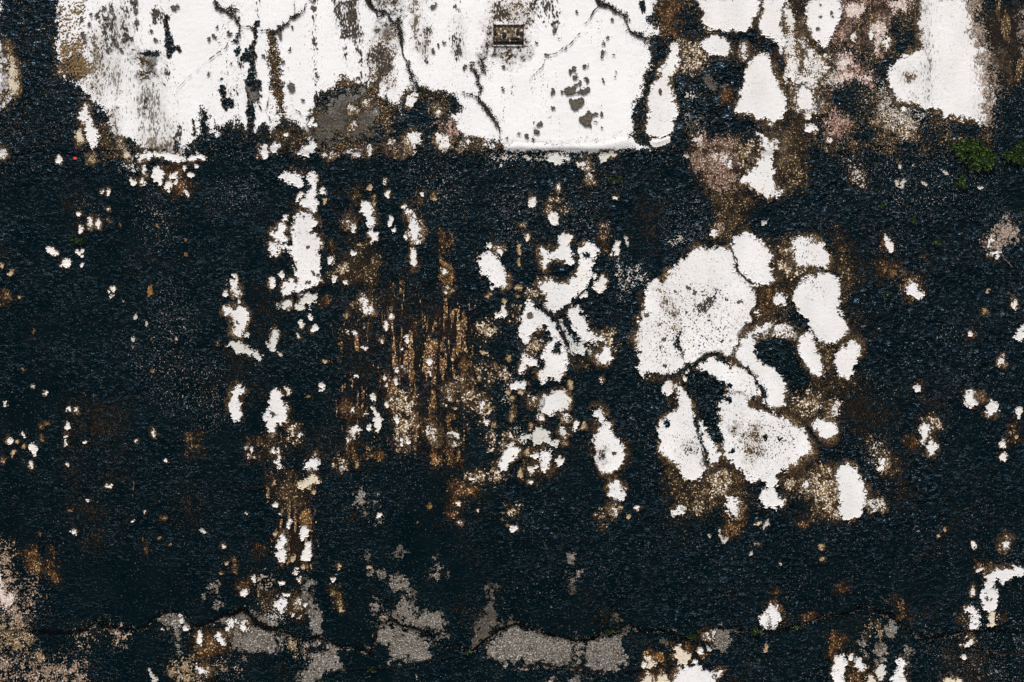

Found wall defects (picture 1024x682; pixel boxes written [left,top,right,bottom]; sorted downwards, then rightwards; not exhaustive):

peeling [73,101,207,198]
leakage [0,0,318,176]
crack [179,0,310,87]
leakage [310,0,321,109]
spalling [255,71,477,340]
crack [365,0,504,151]
crack [531,0,651,78]
leakage [331,0,1024,177]
peeling [215,273,283,362]
peeling [439,181,895,533]
crack [644,328,767,404]
peeling [201,380,387,682]